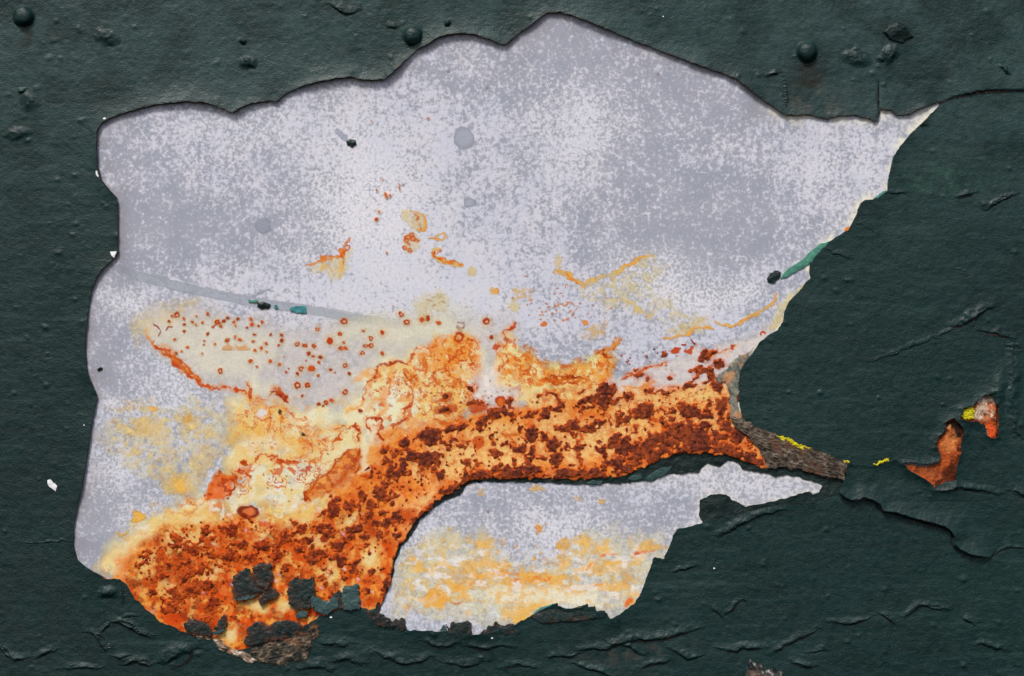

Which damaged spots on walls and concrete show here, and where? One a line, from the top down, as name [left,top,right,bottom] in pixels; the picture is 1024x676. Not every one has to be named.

peeling [183,614,227,637]
corrosion [95,255,802,665]
peeling [74,13,939,579]
peeling [231,460,823,647]